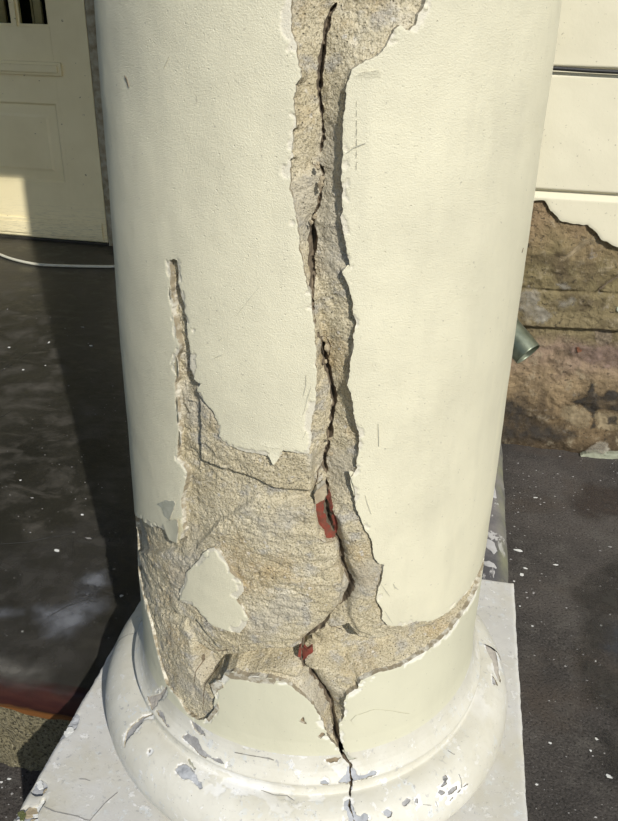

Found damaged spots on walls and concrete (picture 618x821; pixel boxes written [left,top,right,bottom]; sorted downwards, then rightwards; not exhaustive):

spalling [501,200,618,454]
spalling [126,0,421,764]
crack [301,2,355,821]
spalling [60,714,80,740]
peeling [175,759,203,789]
peeling [338,766,376,789]
spalling [16,780,48,821]
peeling [344,799,369,821]